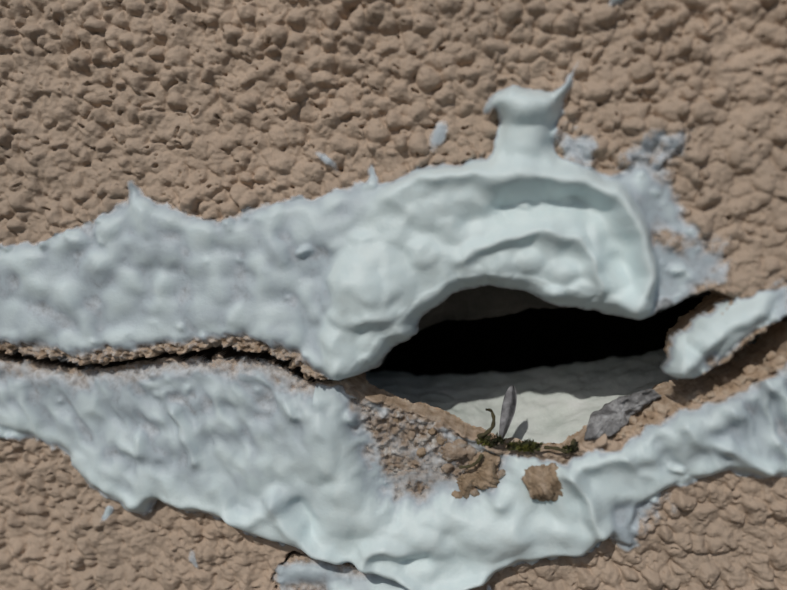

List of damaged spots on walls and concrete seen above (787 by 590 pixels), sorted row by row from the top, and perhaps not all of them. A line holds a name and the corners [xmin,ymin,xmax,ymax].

crack [0,335,344,382]
spalling [366,295,710,376]
spalling [584,345,787,443]
crack [703,316,787,374]
spalling [350,398,506,500]
crack [270,551,302,588]